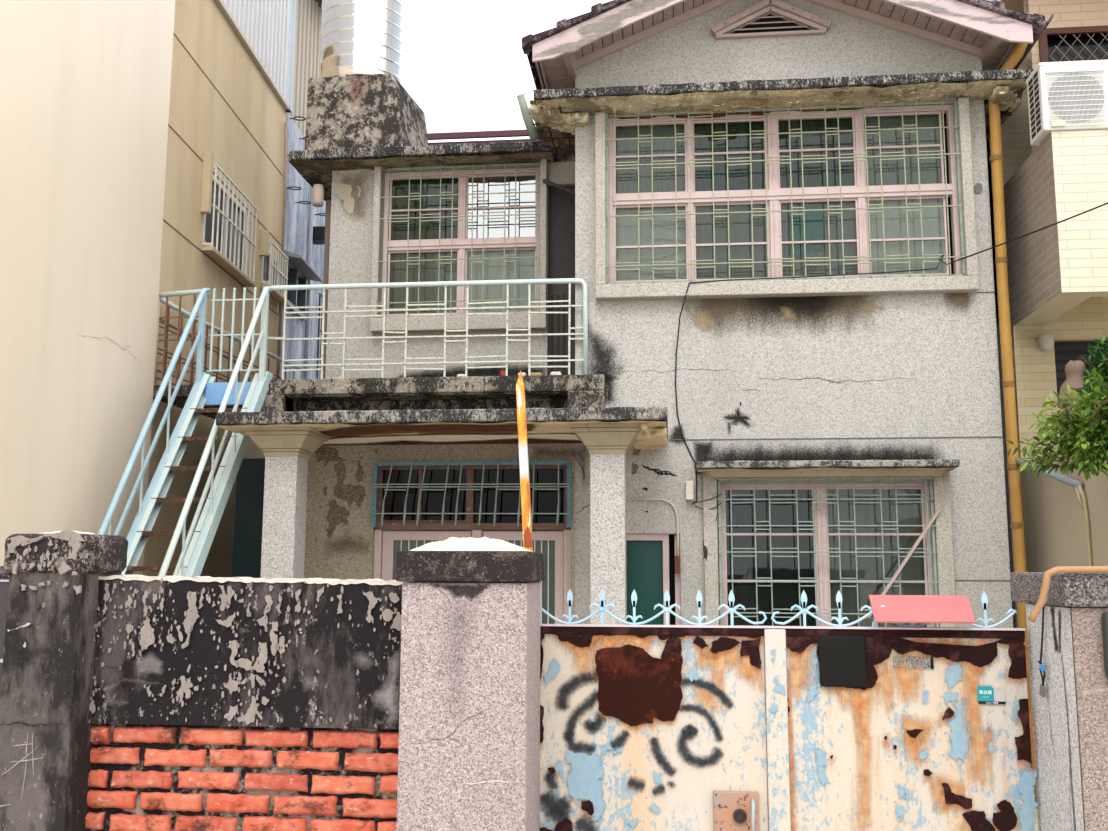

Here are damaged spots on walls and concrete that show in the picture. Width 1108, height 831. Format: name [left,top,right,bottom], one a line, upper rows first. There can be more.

water stain [687,295,876,329]
water stain [588,329,622,403]
crack [740,377,911,391]
spalling [315,434,580,538]
water stain [669,427,937,473]
peeling [4,530,84,594]
peeling [89,578,352,726]
peeling [362,589,401,658]
corrosion [540,634,762,730]
corrosion [786,636,819,831]
corrosion [827,637,1028,831]
corrosion [1015,699,1034,768]